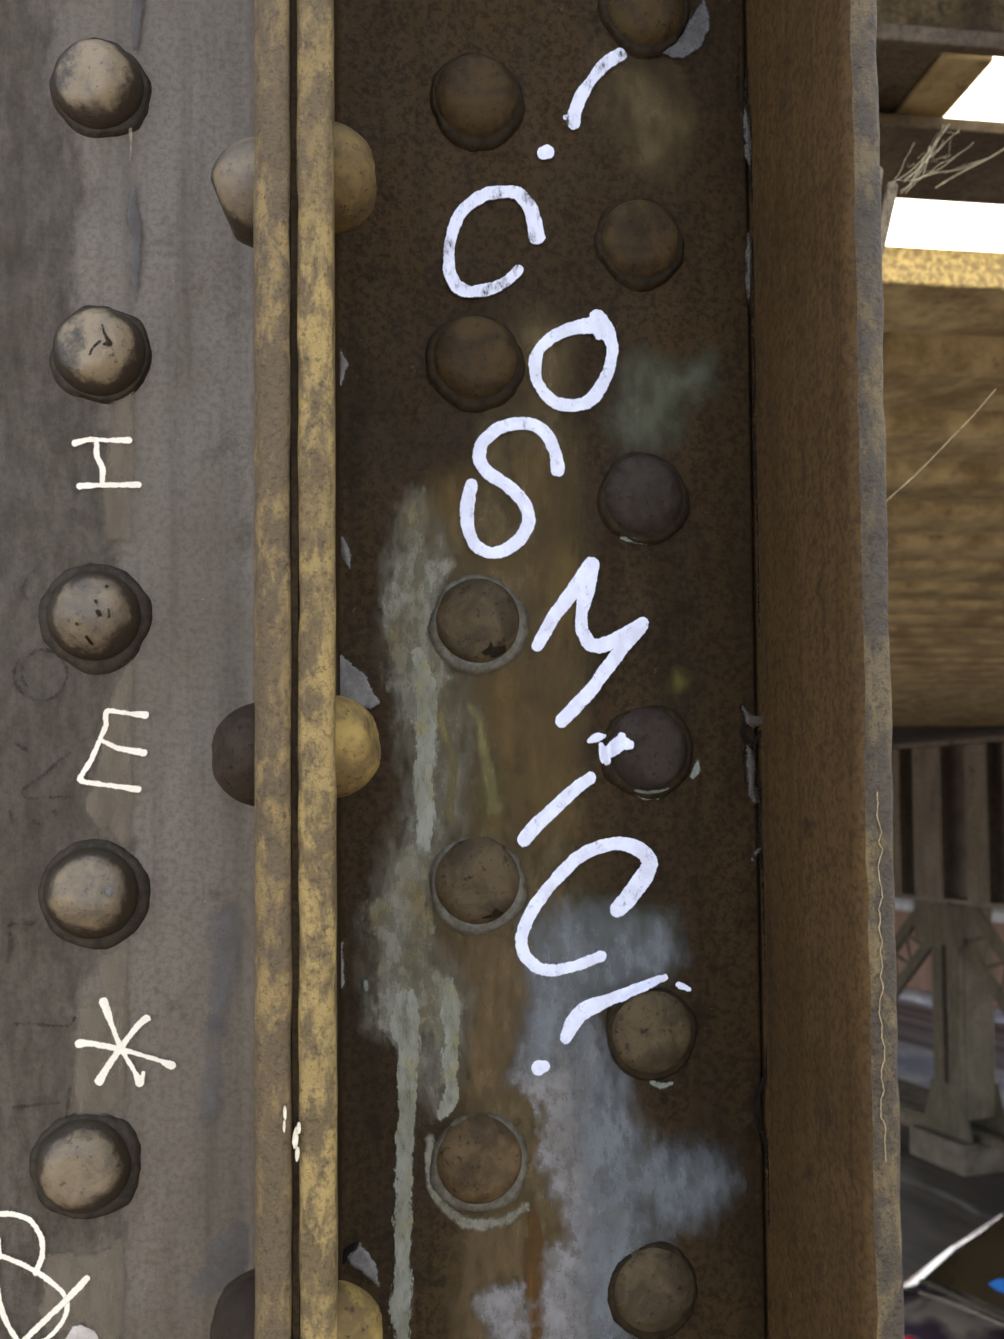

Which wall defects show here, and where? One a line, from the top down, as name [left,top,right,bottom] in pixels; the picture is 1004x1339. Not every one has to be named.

rust [420,475,464,553]
rust [460,452,577,838]
water stain [360,325,727,1339]
rust [434,929,539,1103]
rust [459,1207,547,1339]